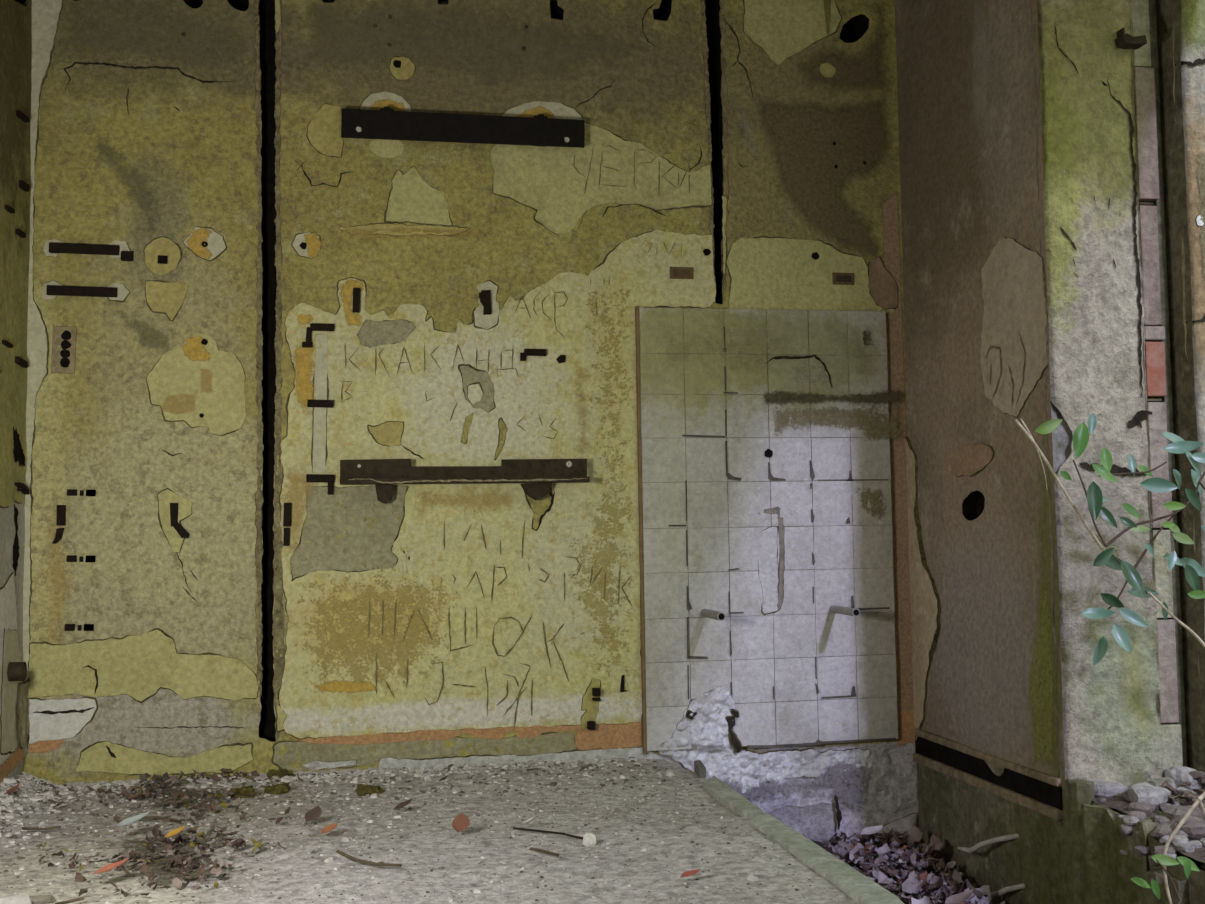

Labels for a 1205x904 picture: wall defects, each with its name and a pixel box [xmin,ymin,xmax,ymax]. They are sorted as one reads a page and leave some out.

peeling [0,0,898,786]
damp [761,7,888,254]
crack [1054,25,1143,397]
spalling [656,436,1069,904]